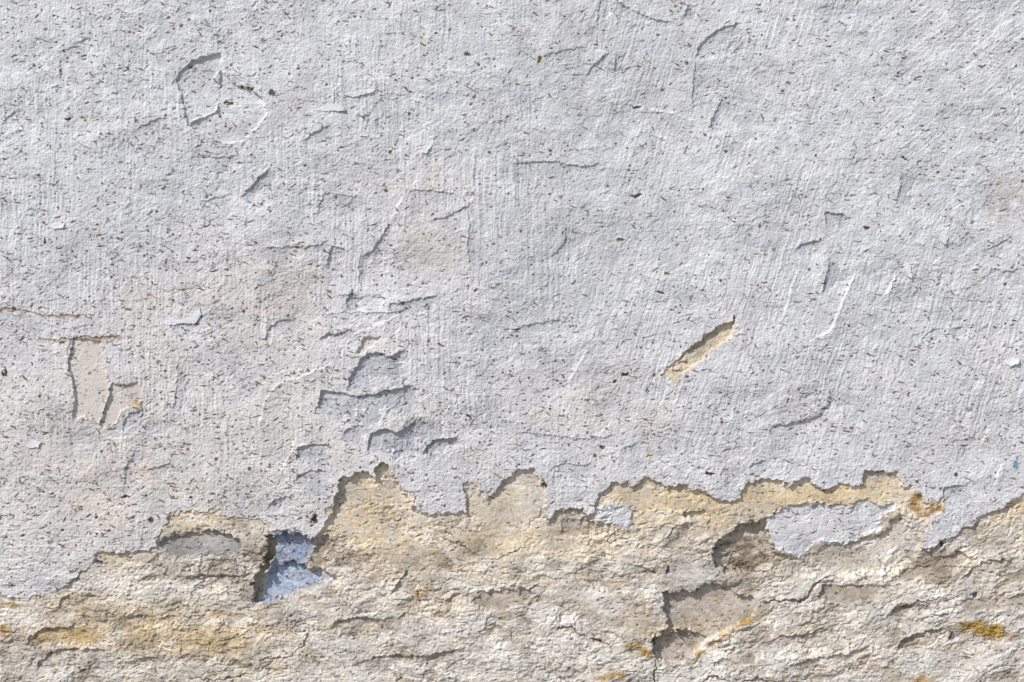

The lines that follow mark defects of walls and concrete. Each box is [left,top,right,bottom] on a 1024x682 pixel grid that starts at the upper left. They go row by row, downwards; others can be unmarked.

spalling [0,187,1024,682]